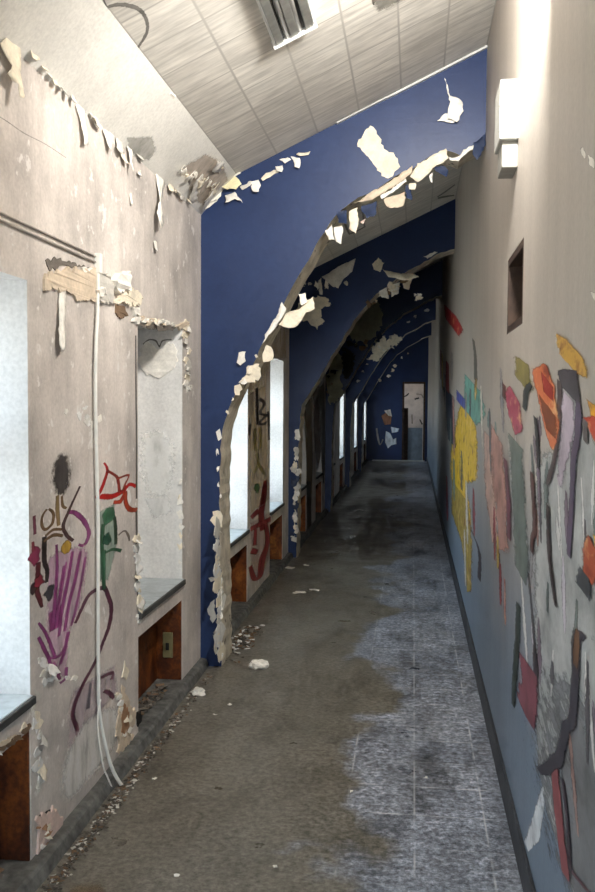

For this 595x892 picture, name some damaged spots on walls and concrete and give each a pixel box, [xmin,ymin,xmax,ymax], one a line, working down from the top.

peeling [438,78,463,123]
peeling [325,126,486,244]
spalling [42,257,193,392]
peeling [226,259,355,414]
spalling [326,258,429,405]
peeling [132,533,146,624]
peeling [177,479,185,564]
spalling [207,510,226,663]
spalling [64,661,142,796]
spalling [34,805,63,855]